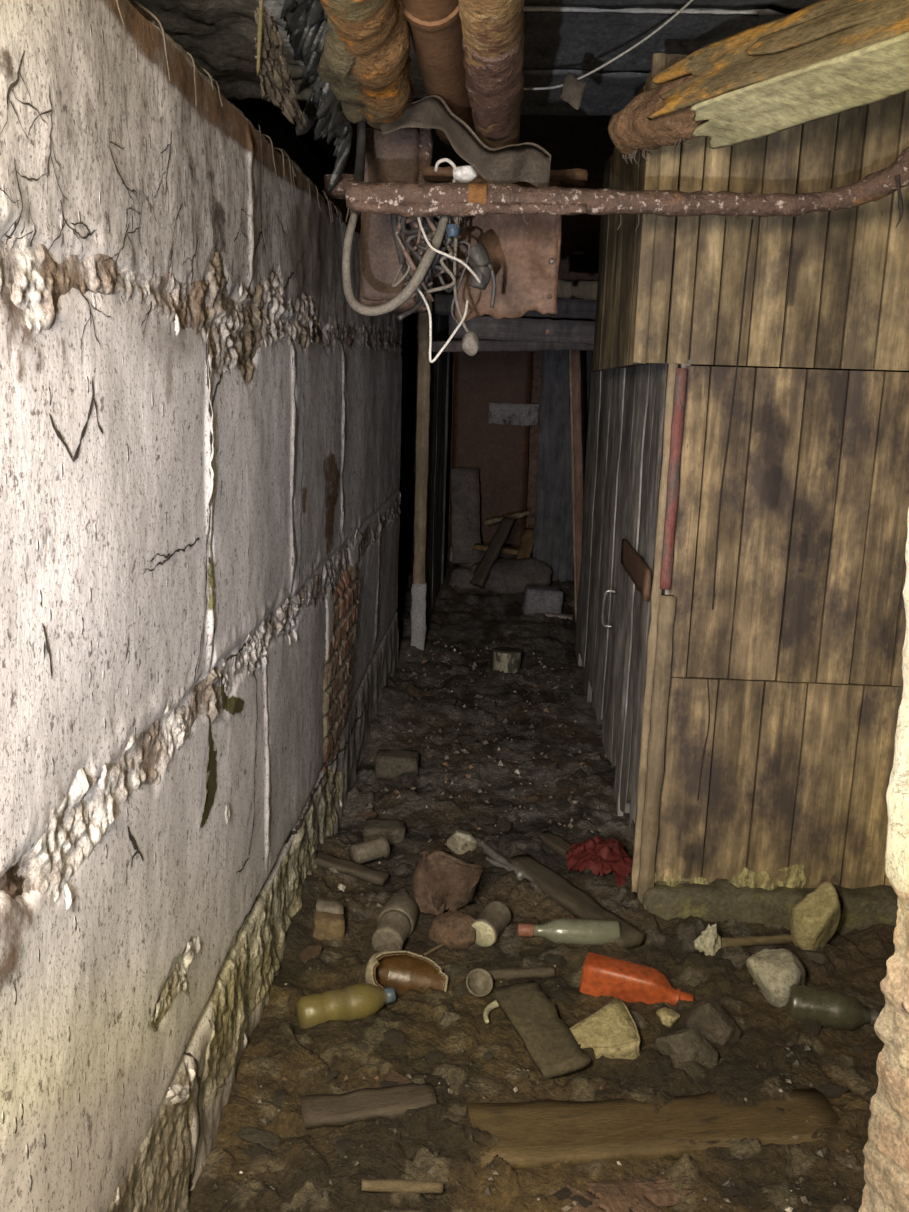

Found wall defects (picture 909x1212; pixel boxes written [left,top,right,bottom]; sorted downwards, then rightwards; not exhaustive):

crack [0,51,200,462]
spalling [0,233,402,384]
crack [143,327,368,933]
corrosion [324,451,340,555]
spalling [0,493,401,1212]